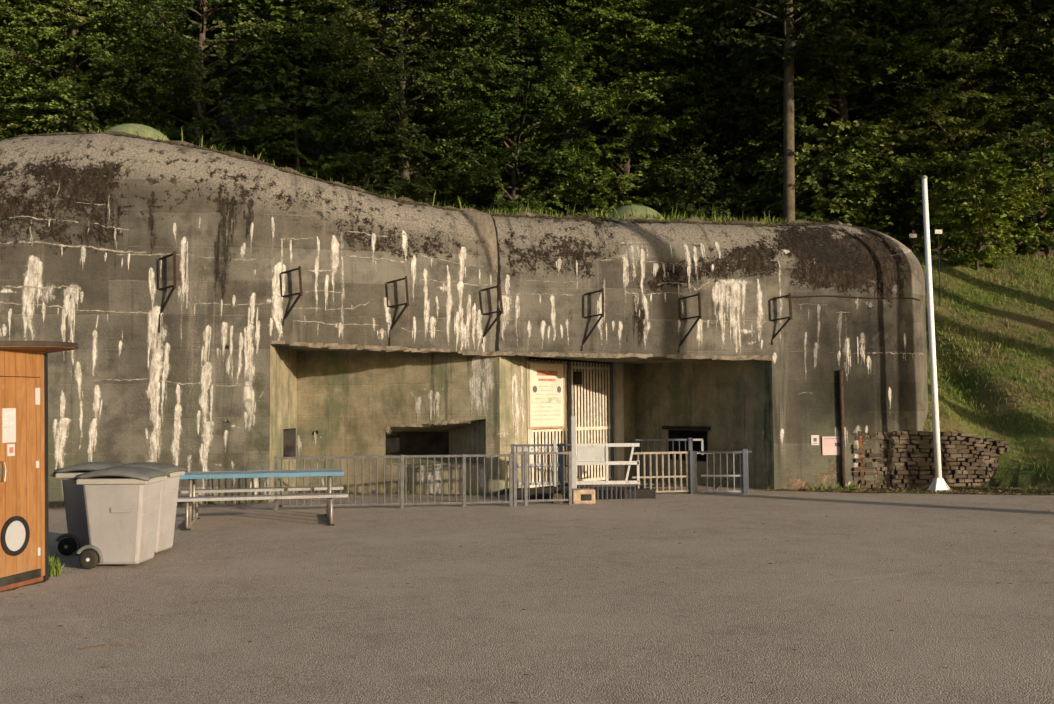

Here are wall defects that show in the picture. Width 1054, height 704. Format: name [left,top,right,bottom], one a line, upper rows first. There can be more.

leakage [0,255,102,470]
leakage [79,180,120,265]
leakage [145,191,286,497]
leakage [373,297,391,339]
leakage [402,230,494,421]
leakage [499,274,569,345]
leakage [594,220,666,347]
leakage [683,241,781,364]